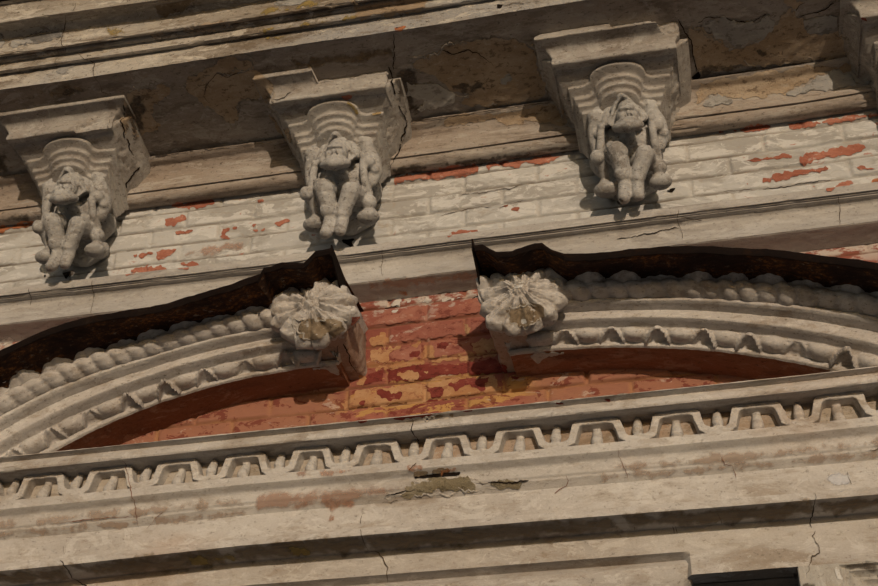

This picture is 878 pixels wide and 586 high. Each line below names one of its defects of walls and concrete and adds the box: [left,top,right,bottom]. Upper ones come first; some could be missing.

crack [679,14,807,79]
spalling [687,8,871,107]
crack [55,4,140,188]
crack [388,26,549,168]
peeling [394,155,559,185]
peeling [747,143,866,183]
peeling [165,199,215,235]
peeling [344,301,519,410]
crack [50,462,162,526]
spalling [382,468,529,503]
crack [360,516,388,580]
crack [806,494,820,574]